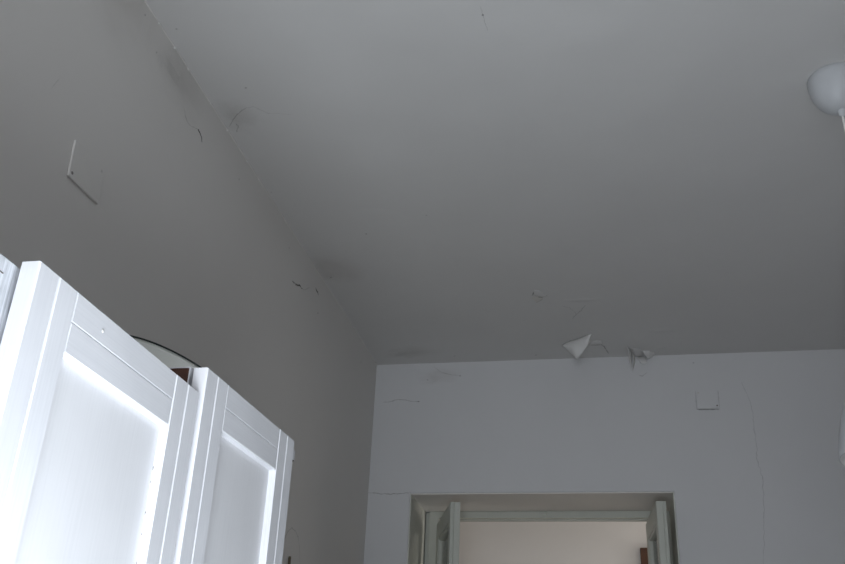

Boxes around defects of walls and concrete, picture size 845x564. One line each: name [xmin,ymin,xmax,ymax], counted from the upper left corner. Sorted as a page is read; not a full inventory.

peeling [561,333,603,360]